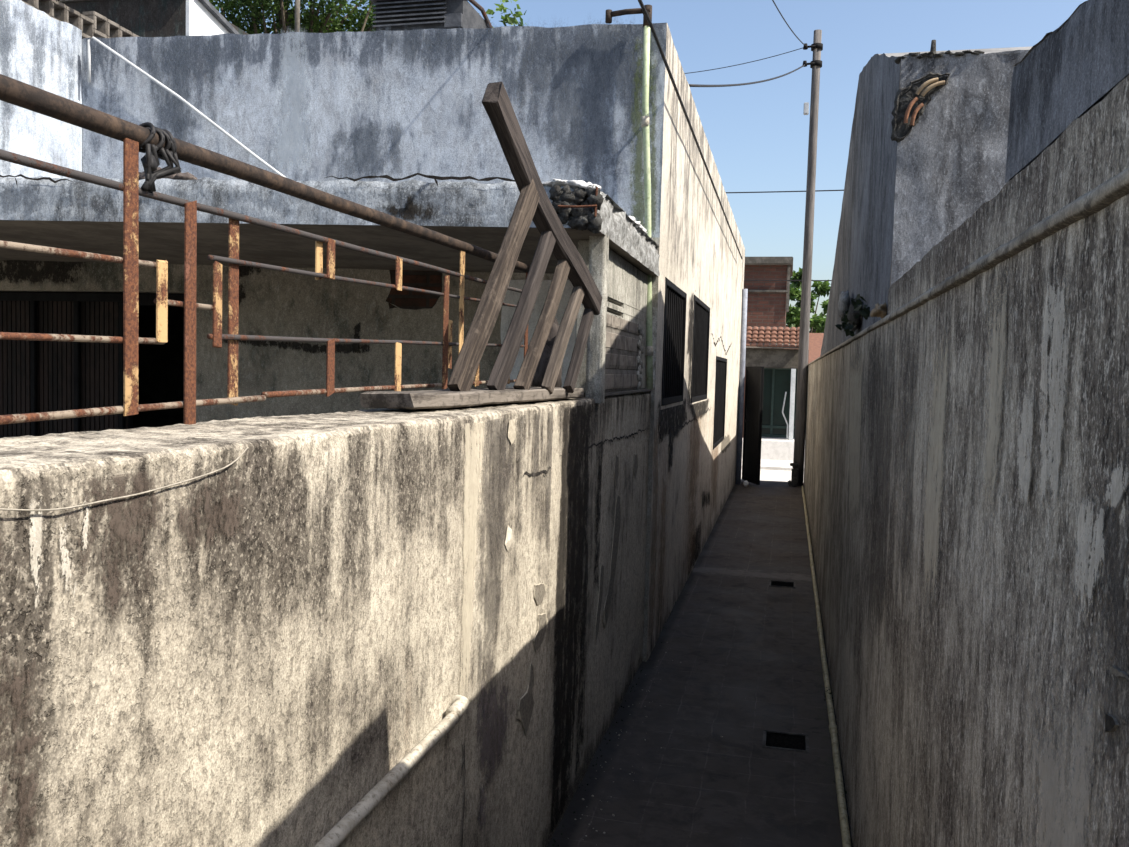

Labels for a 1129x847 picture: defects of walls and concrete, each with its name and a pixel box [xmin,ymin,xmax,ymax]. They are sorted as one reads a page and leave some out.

damp [383,196,436,220]
crack [325,173,515,186]
damp [517,24,636,183]
damp [0,628,41,847]
damp [30,506,42,607]
damp [60,471,159,609]
peeling [516,583,548,736]
damp [550,404,603,836]
damp [922,334,948,597]
damp [983,289,1007,498]
damp [1017,281,1068,503]
damp [1075,461,1128,607]